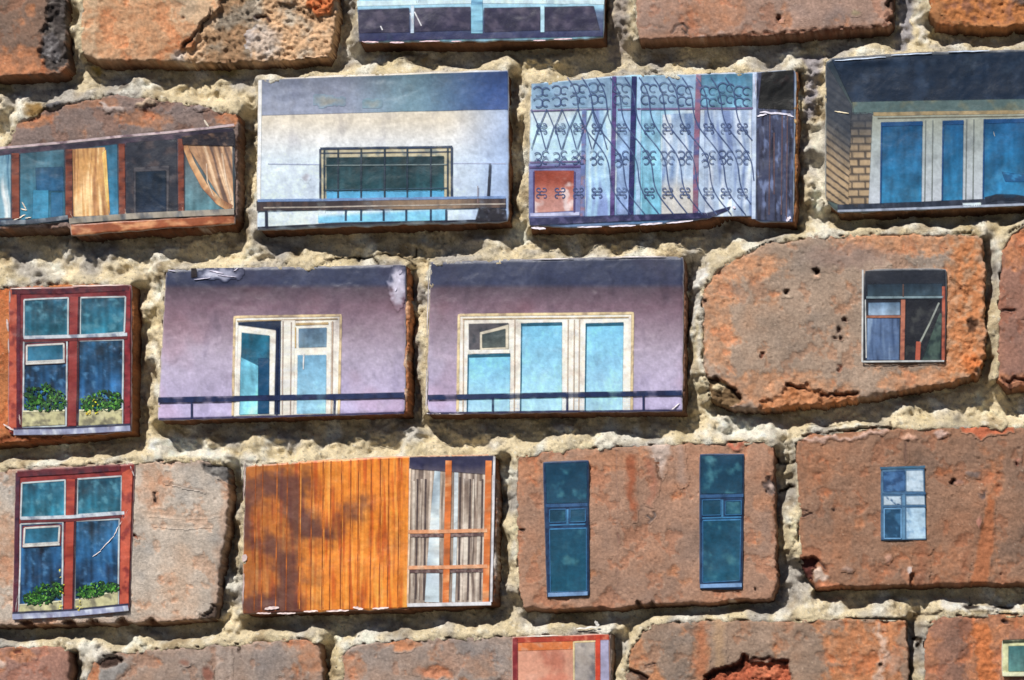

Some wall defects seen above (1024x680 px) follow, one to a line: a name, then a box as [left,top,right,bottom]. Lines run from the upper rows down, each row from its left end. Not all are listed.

spalling [37,0,76,80]
spalling [186,0,343,72]
spalling [706,373,743,412]
spalling [758,381,860,415]
spalling [800,555,855,592]
spalling [707,652,793,680]